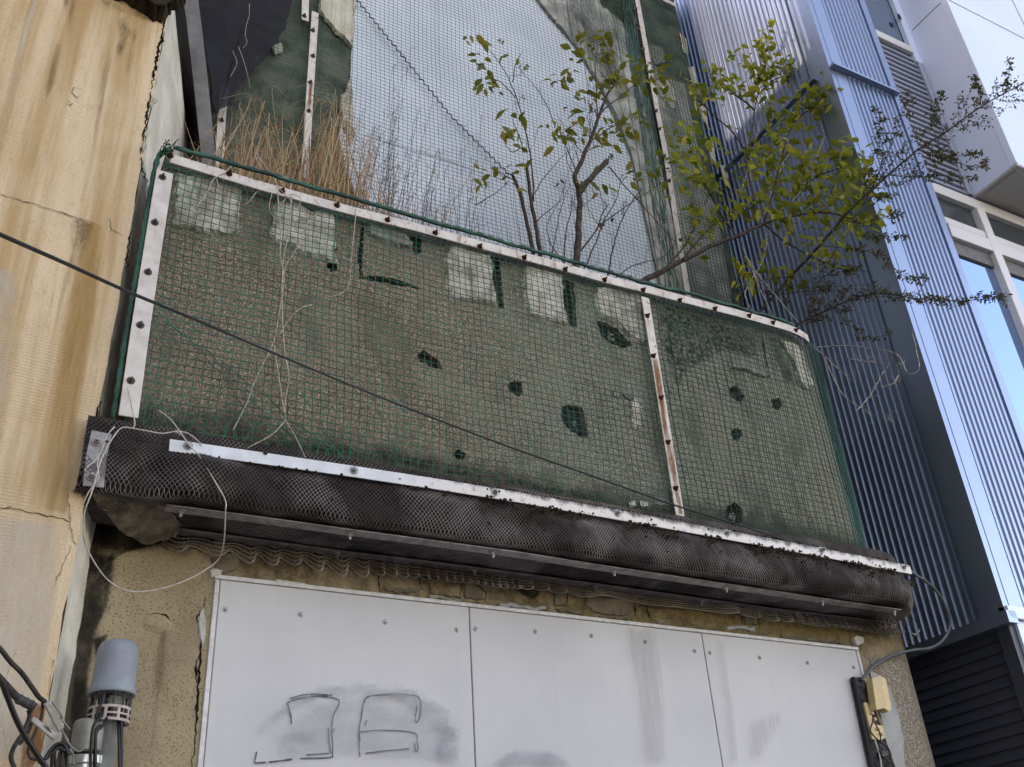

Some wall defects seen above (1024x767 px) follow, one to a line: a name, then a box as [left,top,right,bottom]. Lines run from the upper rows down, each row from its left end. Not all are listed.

crack [2,194,122,235]
corrosion [653,360,682,513]
crack [0,505,70,522]
damp [71,556,114,724]